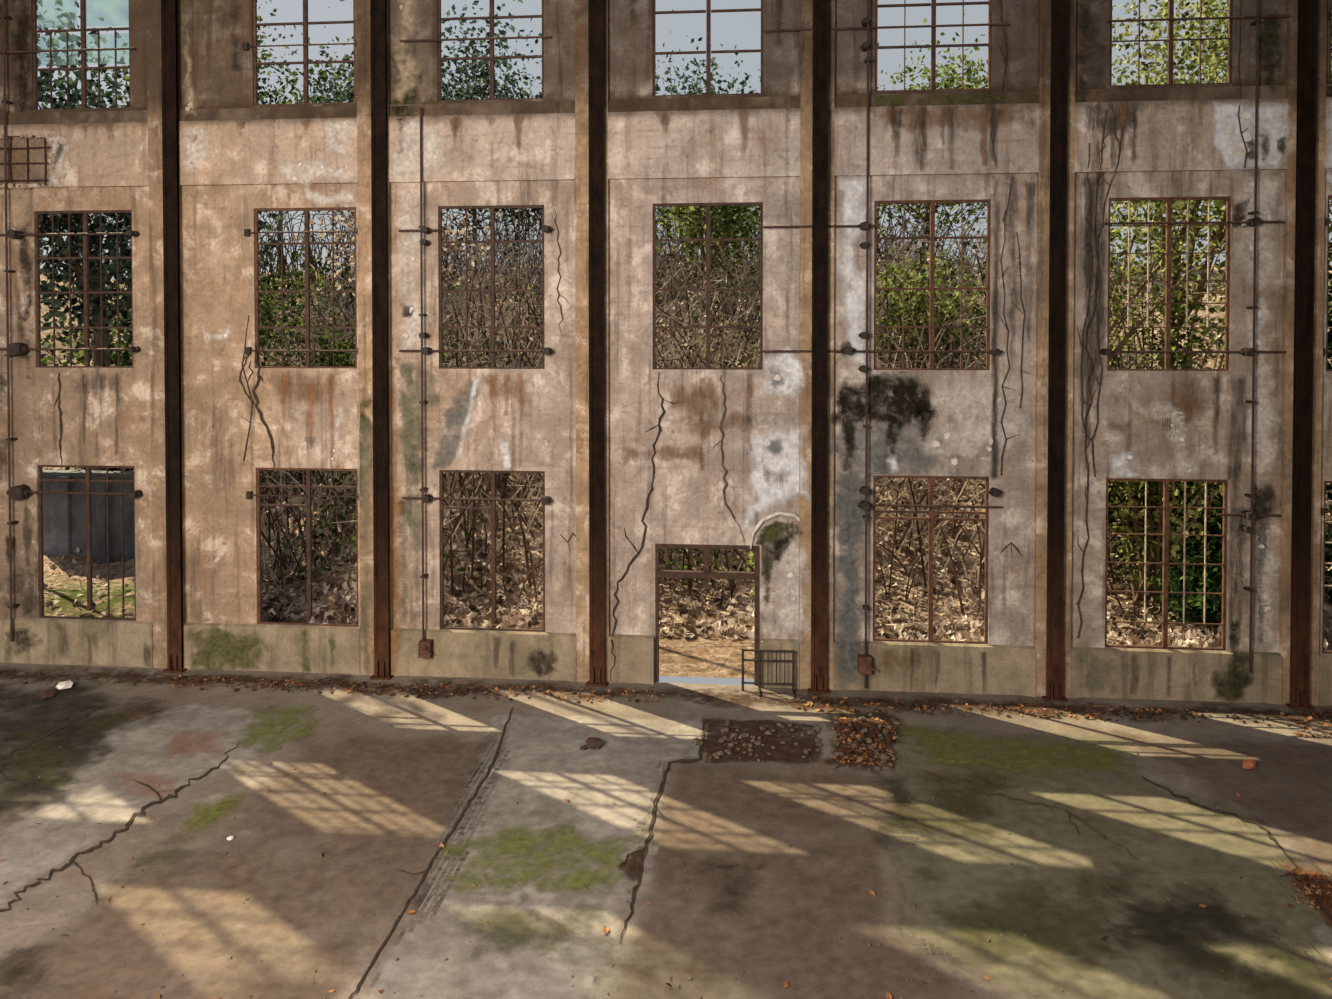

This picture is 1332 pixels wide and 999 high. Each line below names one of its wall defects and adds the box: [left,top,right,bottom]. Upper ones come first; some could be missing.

water stain [877,94,1013,164]
crack [239,346,275,469]
crack [610,372,680,679]
crack [713,375,745,541]
flaking render [745,430,806,527]
flaking render [765,349,803,394]
water stain [1084,176,1103,437]
peeling [1214,104,1285,472]
crack [0,741,240,912]
crack [348,707,513,999]
crack [619,722,704,942]